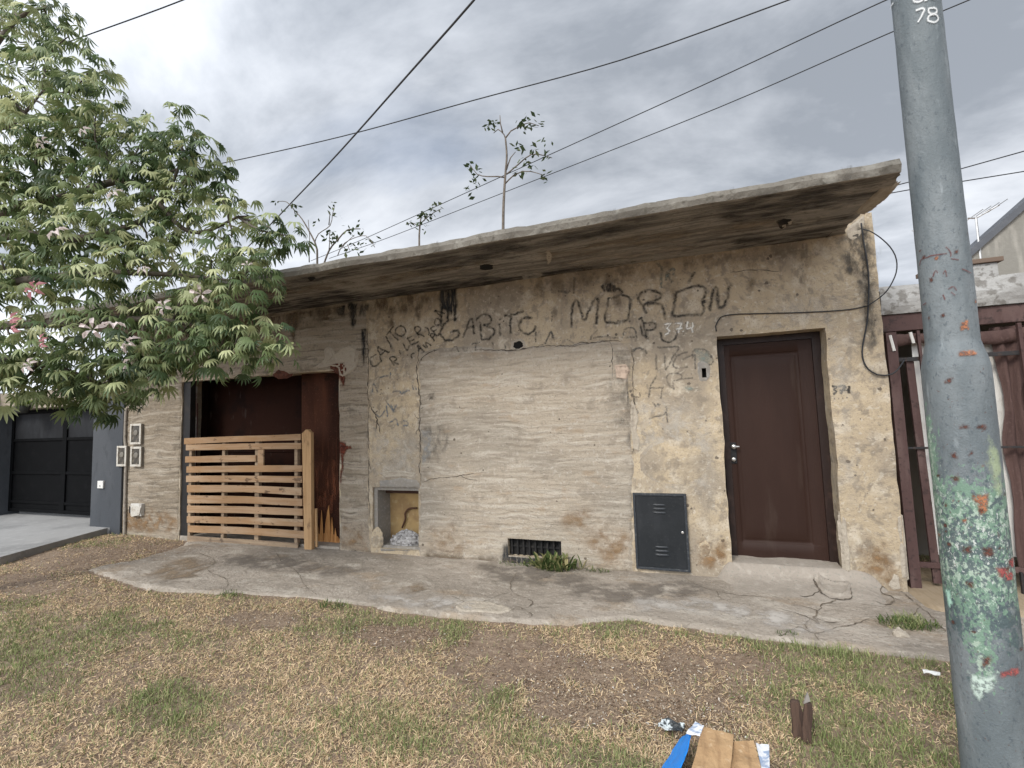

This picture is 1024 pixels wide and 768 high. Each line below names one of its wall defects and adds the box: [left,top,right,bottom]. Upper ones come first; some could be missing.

water stain [722,168,865,248]
water stain [229,228,693,362]
crack [414,350,476,484]
rust [315,442,351,510]
peeling [972,495,987,513]
crack [802,579,852,600]
peeling [997,558,1014,580]
peeling [972,657,1019,699]